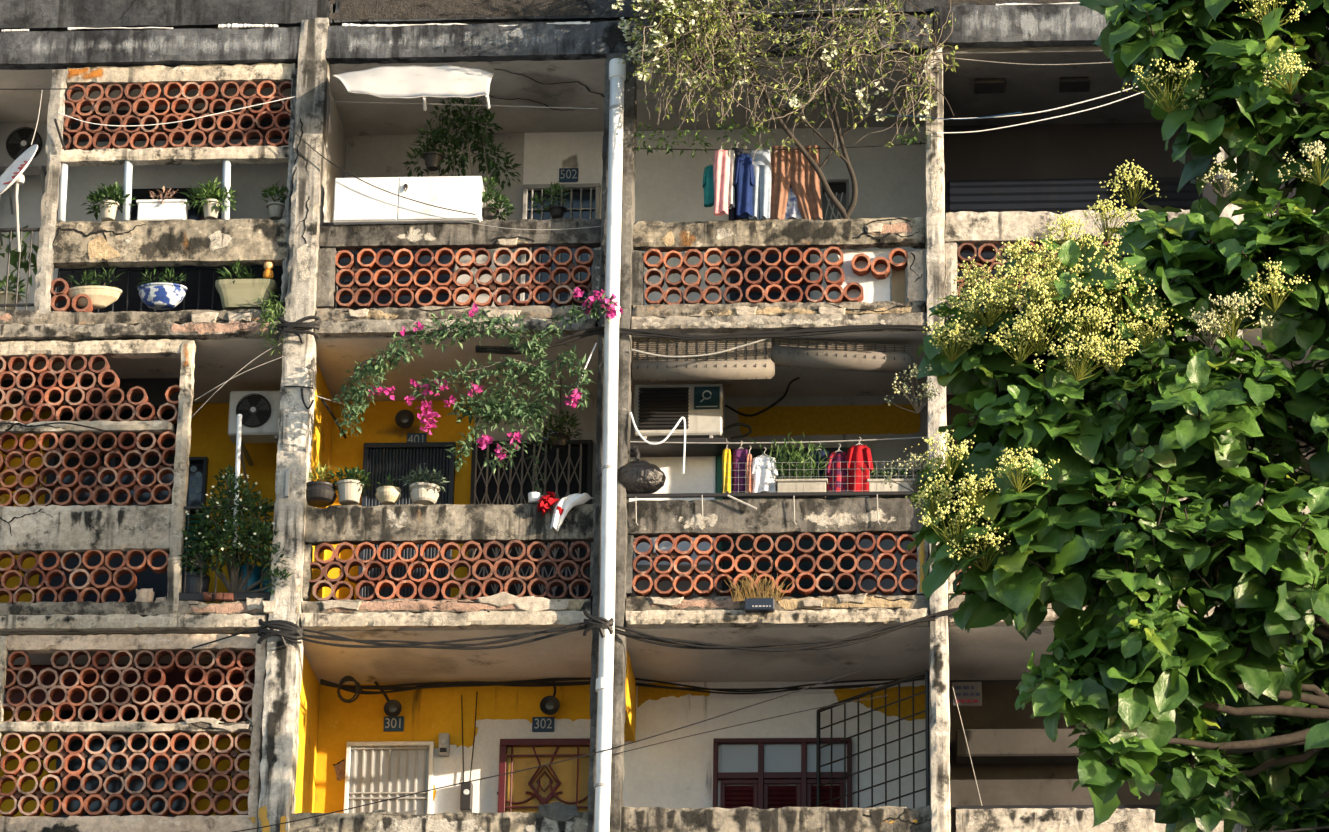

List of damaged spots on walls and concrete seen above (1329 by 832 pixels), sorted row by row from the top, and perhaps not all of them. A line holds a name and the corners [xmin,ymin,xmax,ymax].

damp [1002,9,1102,36]
damp [203,38,277,49]
crack [288,118,310,250]
damp [148,227,229,258]
damp [254,220,288,248]
damp [266,641,288,786]
damp [24,823,78,832]
damp [630,810,645,832]
damp [668,809,718,832]
damp [732,810,804,832]
damp [830,808,884,831]